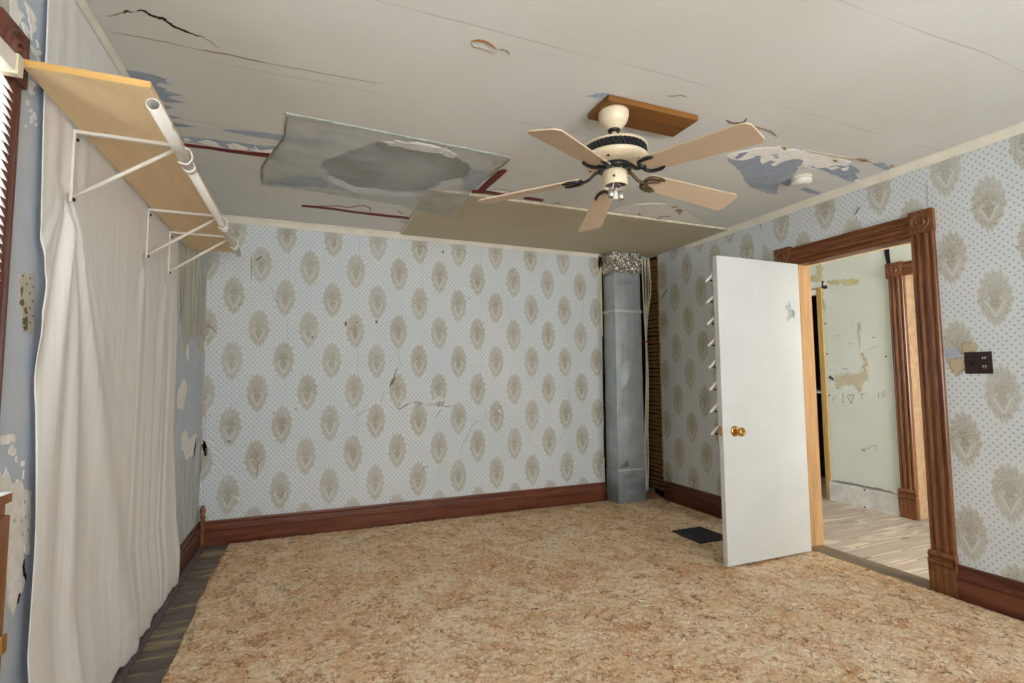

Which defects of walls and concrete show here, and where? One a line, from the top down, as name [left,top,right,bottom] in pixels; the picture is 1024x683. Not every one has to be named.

peeling [0,0,42,62]
crack [111,9,382,84]
peeling [24,80,38,128]
peeling [126,70,344,153]
peeling [727,146,894,195]
peeling [181,417,205,460]
flaking render [0,434,32,618]